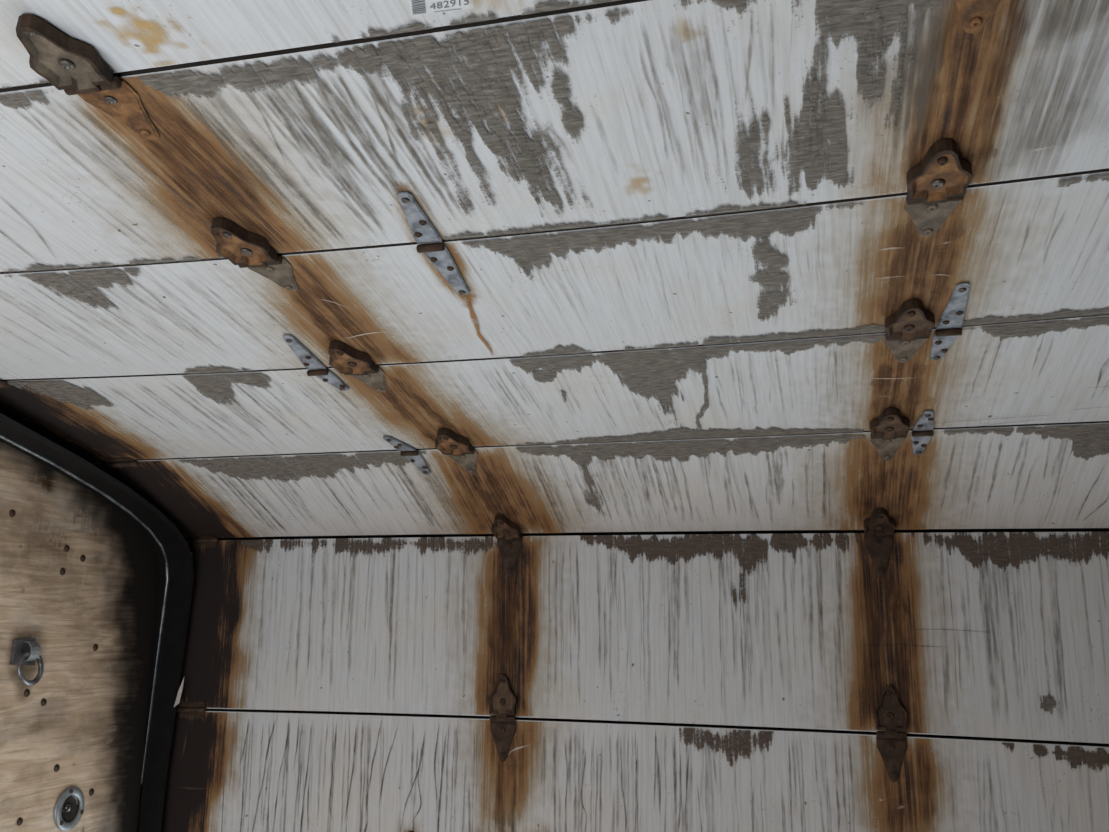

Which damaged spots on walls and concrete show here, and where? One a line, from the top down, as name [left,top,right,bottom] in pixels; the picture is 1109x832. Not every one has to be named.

corrosion [85,75,563,832]
corrosion [841,0,1026,832]